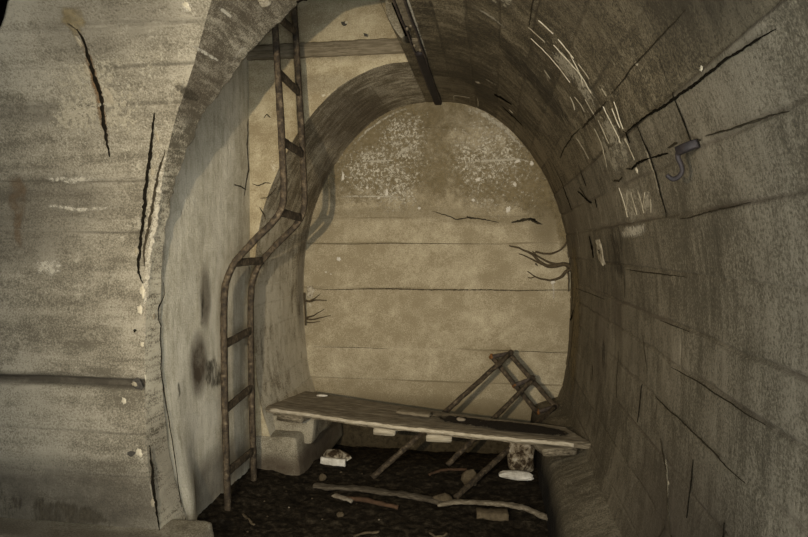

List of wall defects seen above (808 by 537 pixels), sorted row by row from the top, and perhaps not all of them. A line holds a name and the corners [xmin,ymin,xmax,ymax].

crack [67,23,114,157]
crack [552,9,686,210]
crack [614,28,789,219]
crack [134,113,165,283]
spalling [137,158,166,314]
crack [313,285,546,293]
crack [433,211,542,225]
spalling [589,236,606,266]
crack [152,282,182,507]
crack [637,335,745,483]
crack [671,367,765,425]
crack [149,445,160,530]